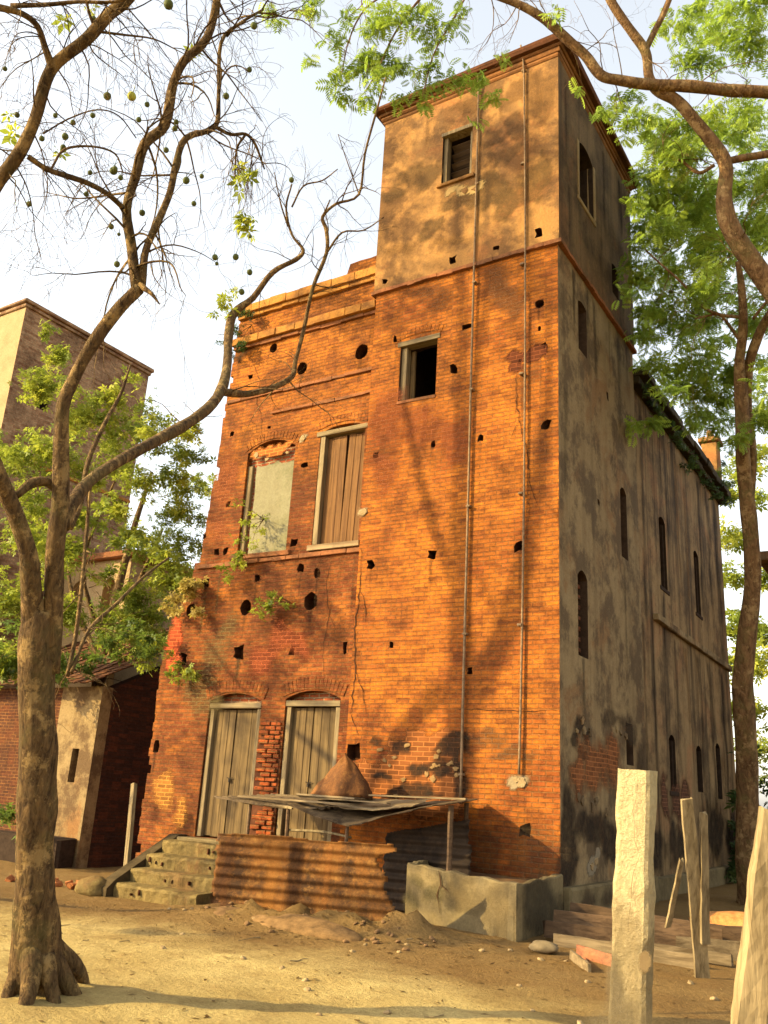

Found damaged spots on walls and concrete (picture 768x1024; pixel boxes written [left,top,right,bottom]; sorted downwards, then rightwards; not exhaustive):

peeling [250,435,307,461]
crack [323,548,366,736]
spalling [358,727,466,825]
peeling [507,776,528,789]
spalling [570,716,628,817]
water stain [702,673,729,789]
corrosion [263,840,304,910]